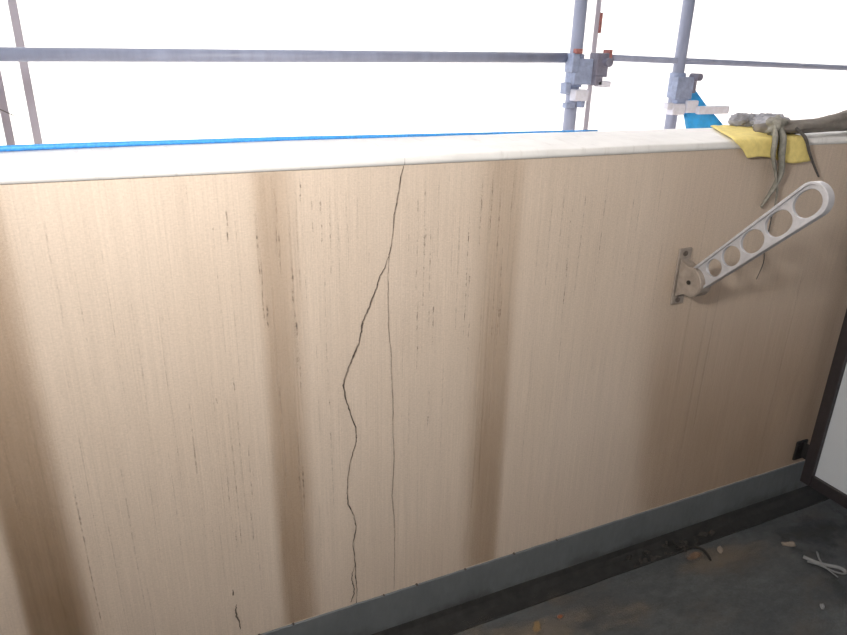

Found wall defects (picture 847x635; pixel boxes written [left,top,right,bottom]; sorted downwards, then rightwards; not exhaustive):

crack [343,166,404,603]